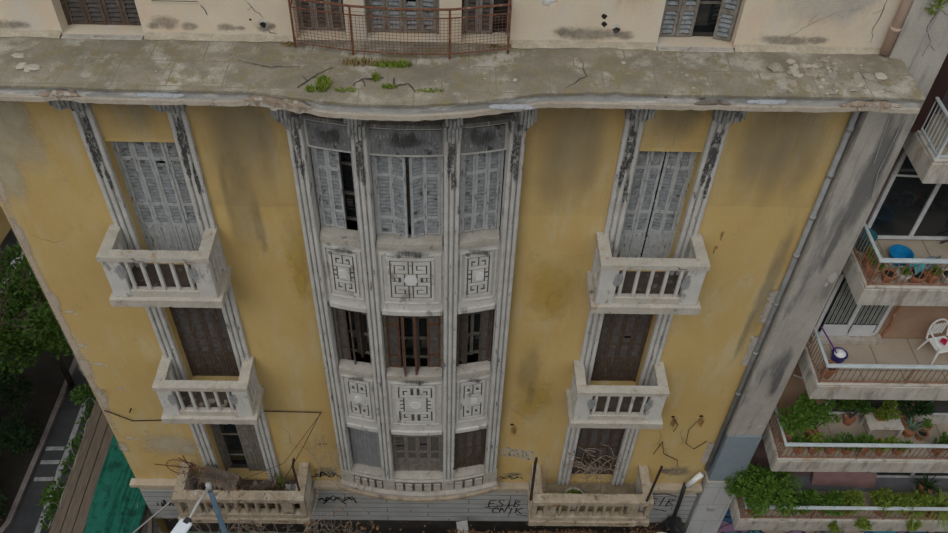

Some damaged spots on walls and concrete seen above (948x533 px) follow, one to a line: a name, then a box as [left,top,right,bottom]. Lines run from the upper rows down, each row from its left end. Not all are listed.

crack [774,1,887,43]
spalling [244,95,311,114]